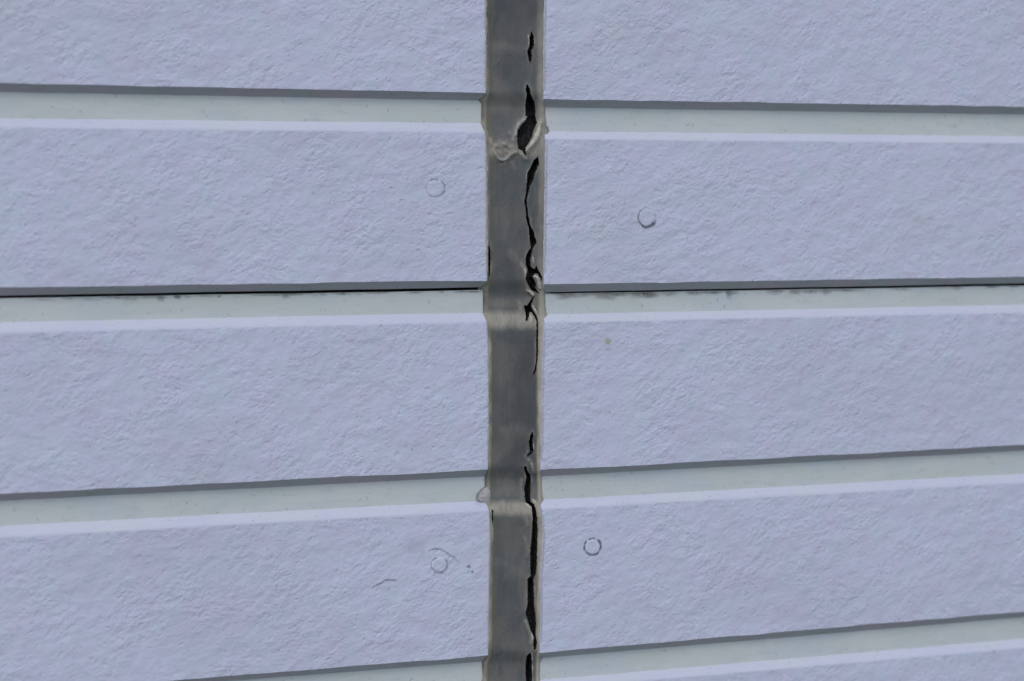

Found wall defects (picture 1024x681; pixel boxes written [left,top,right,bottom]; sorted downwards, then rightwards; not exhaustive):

crack [494,31,542,374]
crack [524,431,538,681]